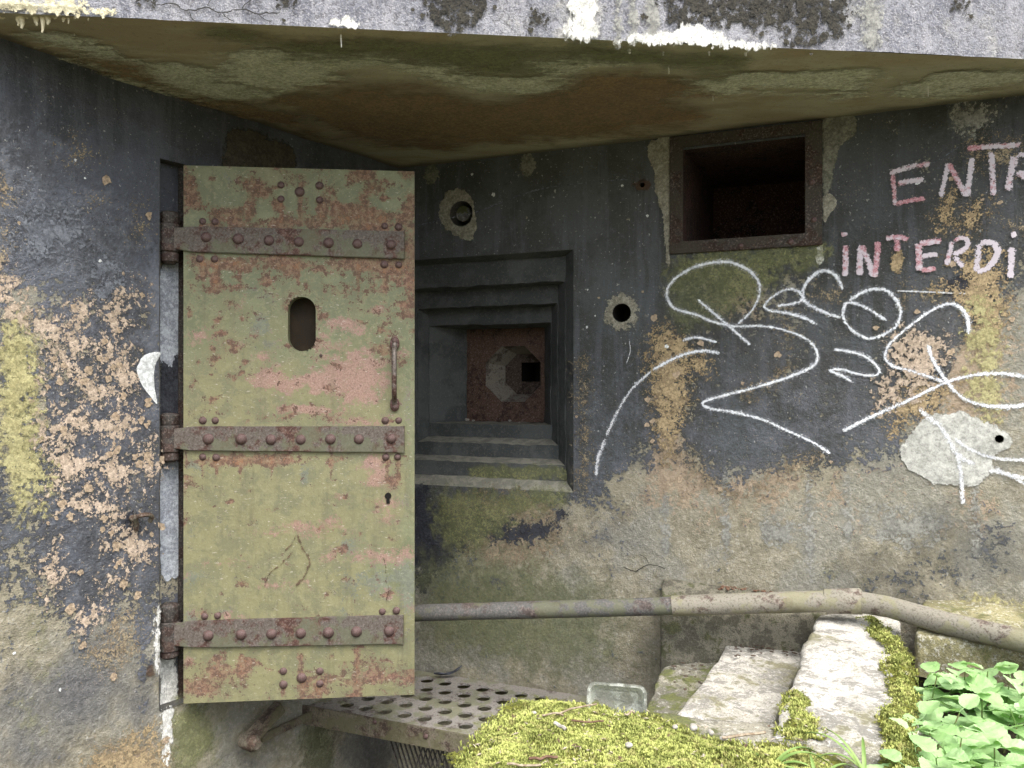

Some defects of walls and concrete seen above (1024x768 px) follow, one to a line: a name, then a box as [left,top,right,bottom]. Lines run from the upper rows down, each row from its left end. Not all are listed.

water stain [0,0,777,105]
water stain [679,67,1024,140]
water stain [853,0,888,50]
spalling [438,188,477,241]
peeling [864,176,1024,452]
spalling [0,170,179,683]
peeling [586,289,833,511]